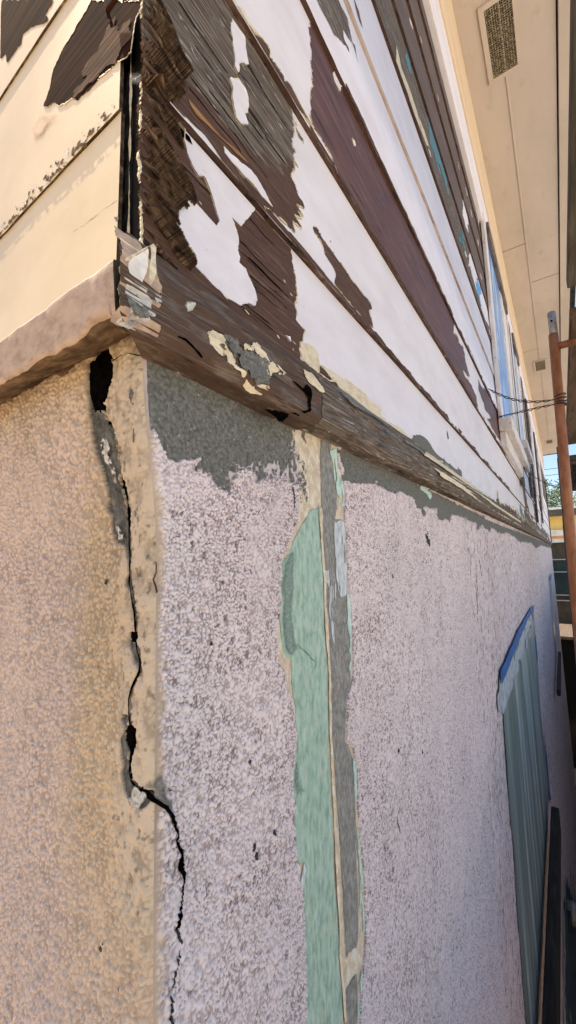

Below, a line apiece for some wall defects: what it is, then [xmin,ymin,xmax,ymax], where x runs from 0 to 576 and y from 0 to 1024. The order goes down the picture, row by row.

peeling [0,0,53,62]
spalling [90,399,132,555]
crack [89,349,141,429]
crack [120,463,187,1024]
peeling [43,0,500,440]
peeling [111,81,551,1024]